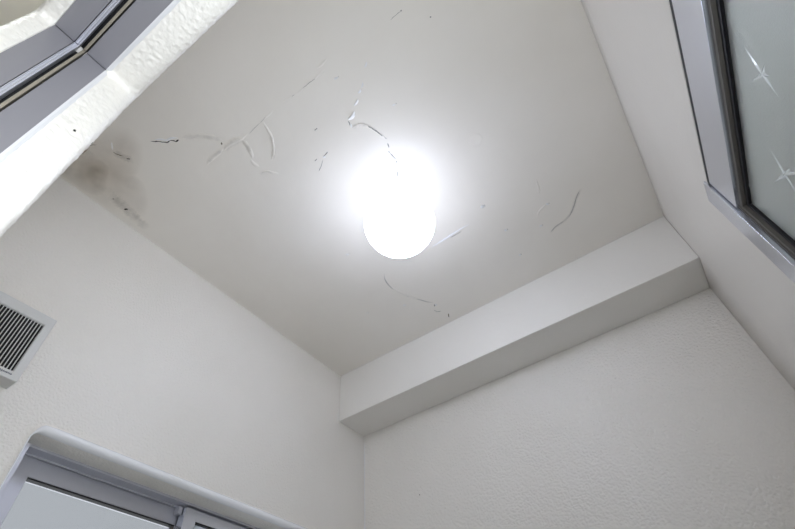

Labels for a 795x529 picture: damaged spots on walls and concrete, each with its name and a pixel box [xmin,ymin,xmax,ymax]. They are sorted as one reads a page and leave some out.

crack [348,62,398,177]